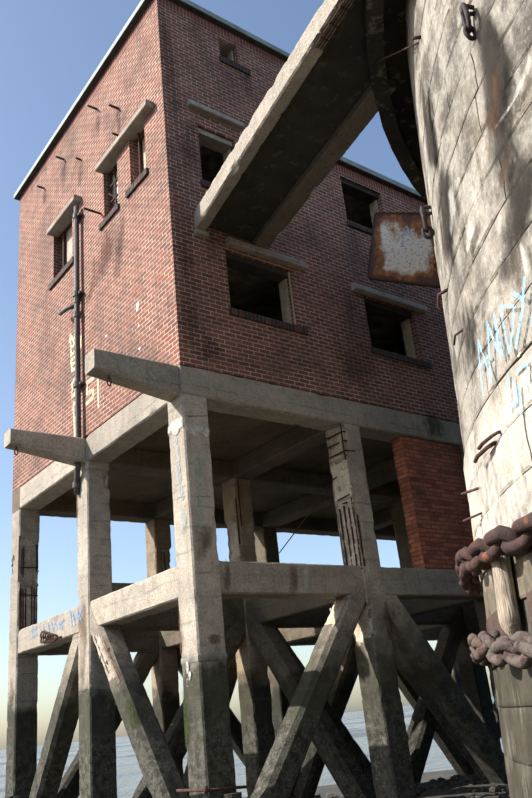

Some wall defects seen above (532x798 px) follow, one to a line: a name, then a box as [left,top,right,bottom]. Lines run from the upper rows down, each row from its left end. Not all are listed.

corrosion [487,72,499,132]
water stain [476,12,532,271]
water stain [422,90,455,264]
water stain [467,221,475,251]
peeling [168,418,209,438]
spalling [326,423,366,570]
spalling [11,536,39,630]
spalling [354,606,374,647]
spalling [93,634,120,684]